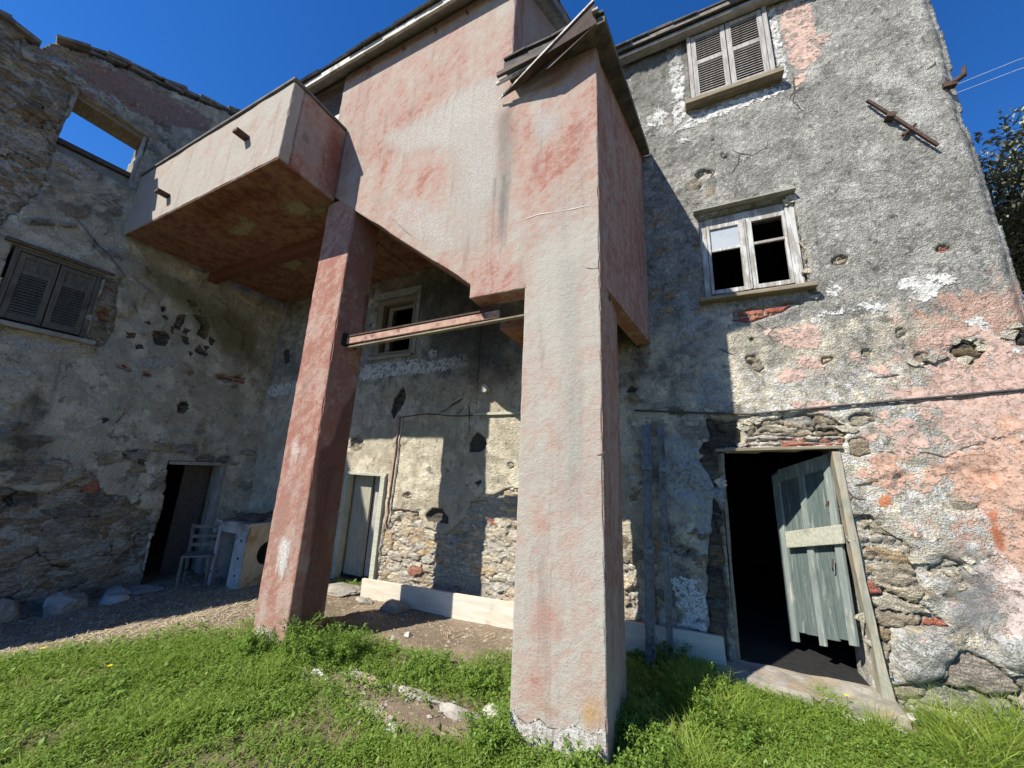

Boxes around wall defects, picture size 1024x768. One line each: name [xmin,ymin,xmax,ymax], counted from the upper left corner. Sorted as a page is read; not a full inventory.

peeling [647,0,830,143]
flaking render [85,275,216,357]
peeling [896,273,959,304]
peeling [359,349,468,418]
flaking render [665,316,1024,717]
peeling [510,708,606,763]